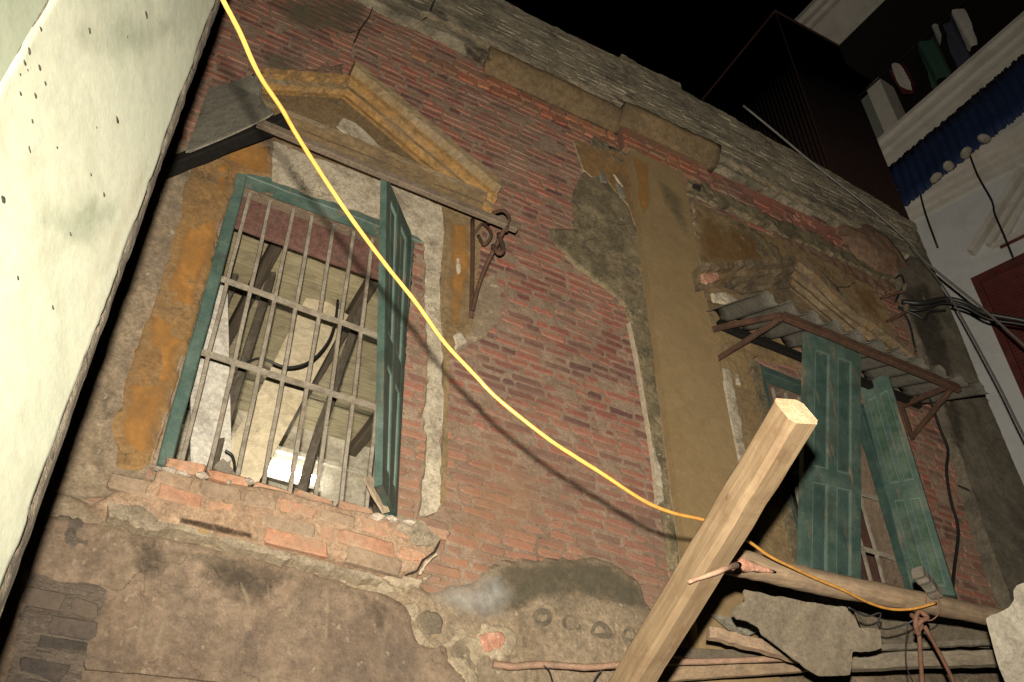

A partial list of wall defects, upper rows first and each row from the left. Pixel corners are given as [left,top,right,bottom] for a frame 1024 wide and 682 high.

crack [345,7,373,46]
corrosion [216,144,265,189]
corrosion [171,217,214,306]
spalling [700,272,737,305]
flaking render [453,332,468,350]
corrosion [126,317,180,451]
peeling [627,322,664,505]
damp [456,564,642,611]